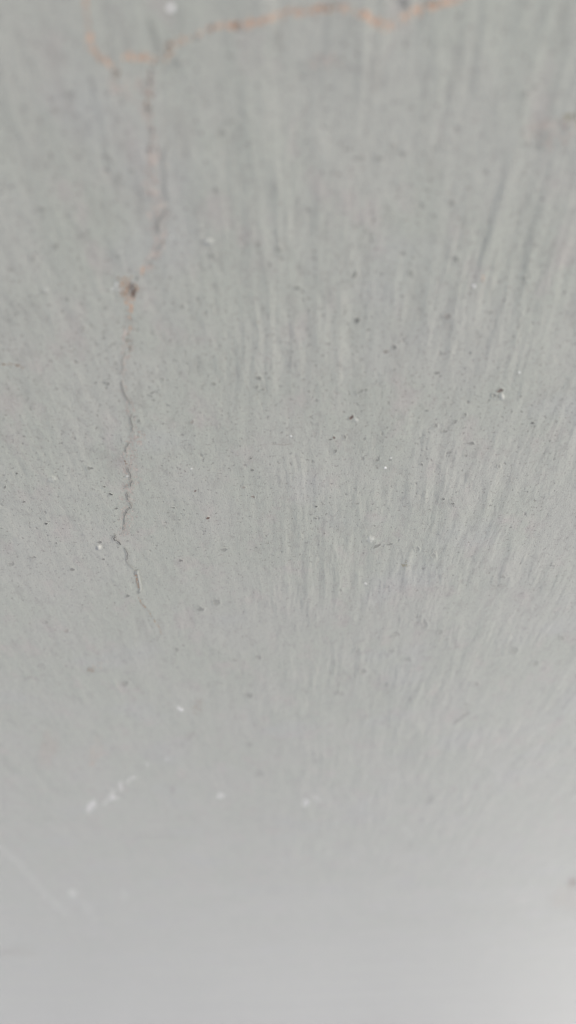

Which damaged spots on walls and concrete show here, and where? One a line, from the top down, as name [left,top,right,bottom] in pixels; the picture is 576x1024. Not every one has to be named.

crack [84,0,462,280]
crack [112,316,161,639]